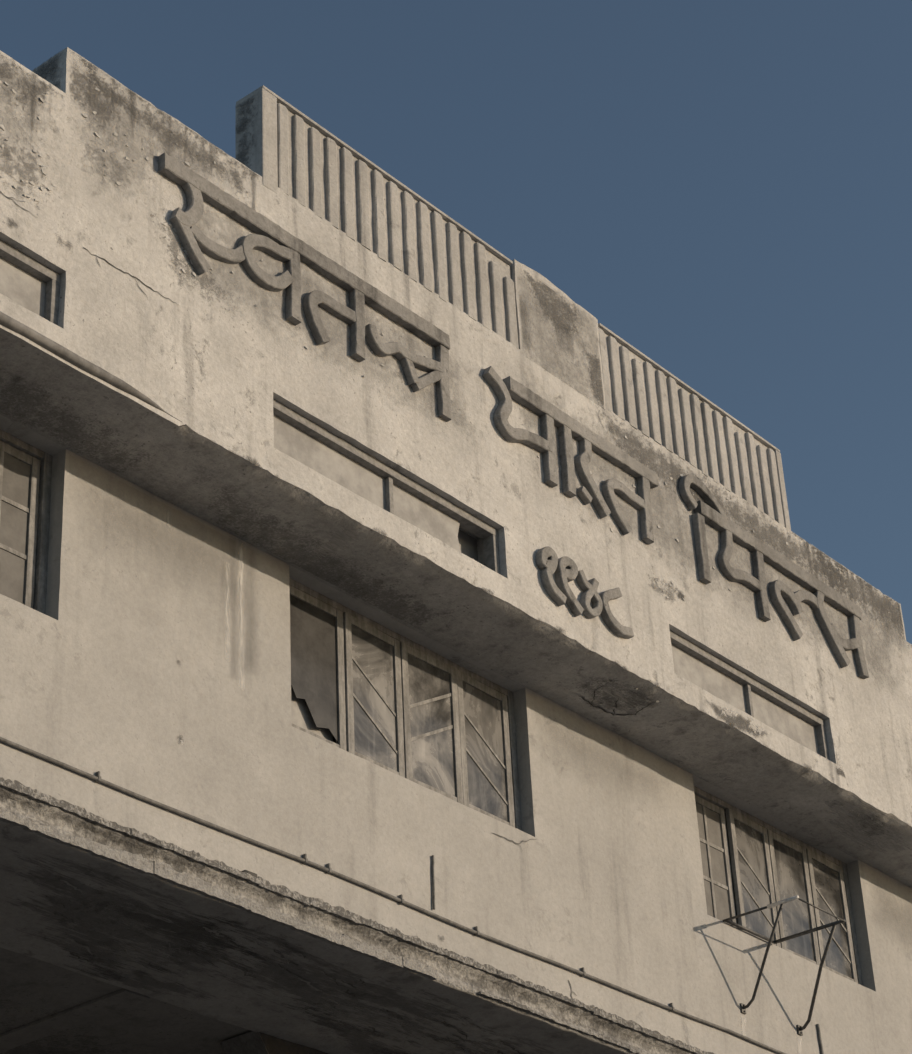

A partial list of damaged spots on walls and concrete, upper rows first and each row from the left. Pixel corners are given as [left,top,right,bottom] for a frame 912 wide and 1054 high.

damp [62,56,259,191]
crack [83,247,175,303]
damp [528,273,578,333]
damp [0,311,182,422]
flaking render [0,777,714,1054]